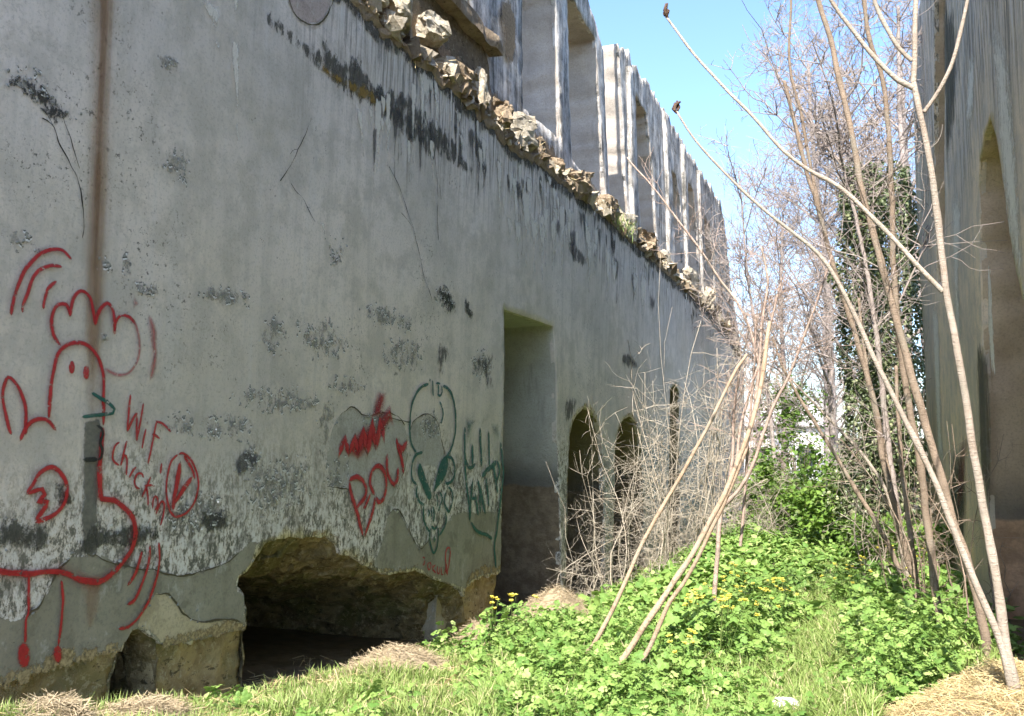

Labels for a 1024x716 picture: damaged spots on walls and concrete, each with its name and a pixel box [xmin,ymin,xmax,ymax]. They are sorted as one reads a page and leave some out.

crack [41,106,84,238]
crack [280,128,315,221]
damp [358,69,668,318]
damp [0,517,50,551]
damp [196,501,232,537]
peeling [0,542,259,709]